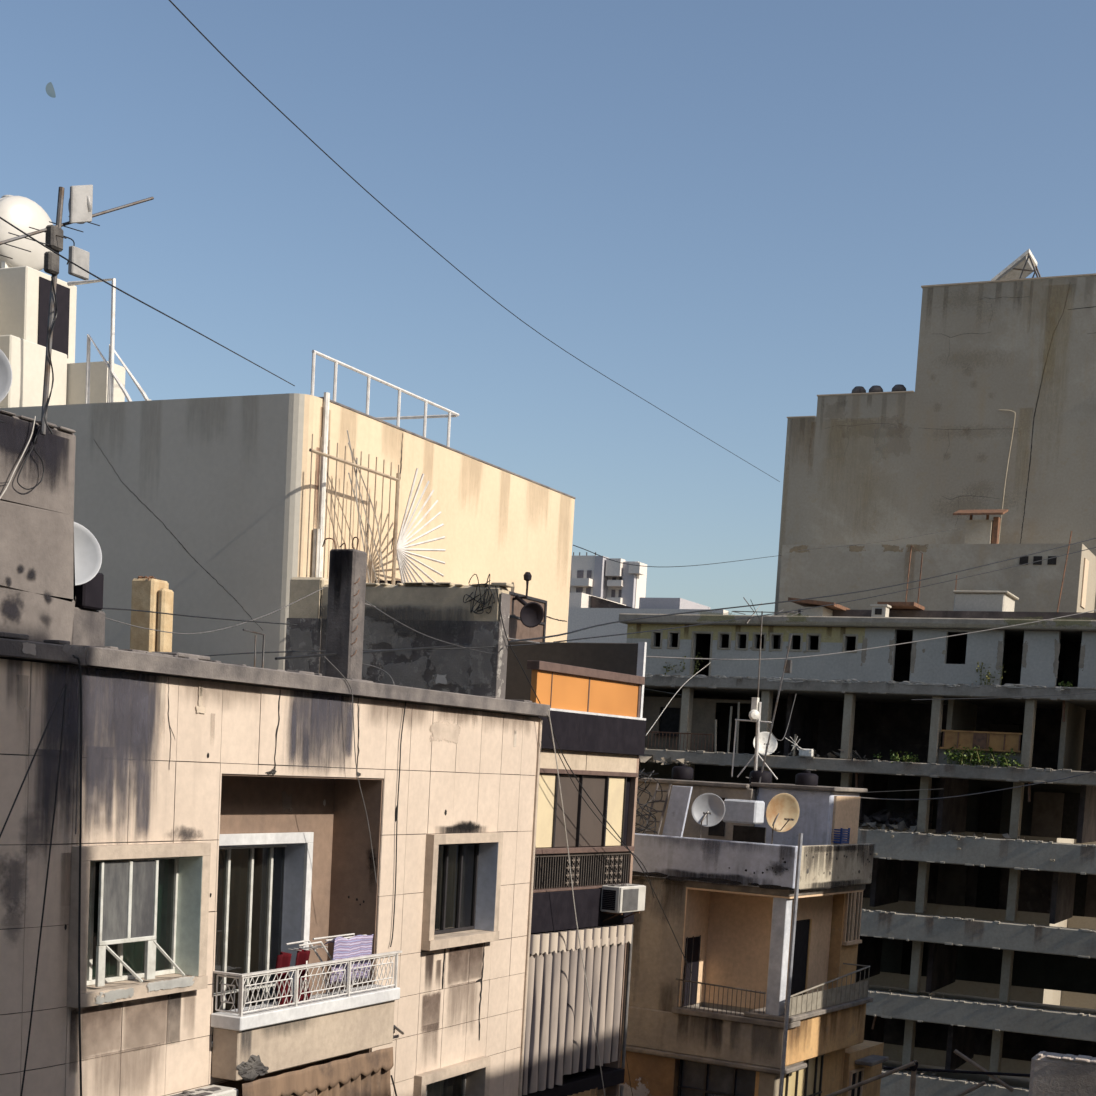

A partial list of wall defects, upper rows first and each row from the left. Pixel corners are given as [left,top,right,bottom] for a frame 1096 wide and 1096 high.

crack [1015,282,1096,543]
water stain [0,414,68,476]
mould [2,565,35,621]
peeling [362,619,376,681]
water stain [39,644,166,829]
water stain [291,690,353,762]
peeling [619,1077,650,1096]